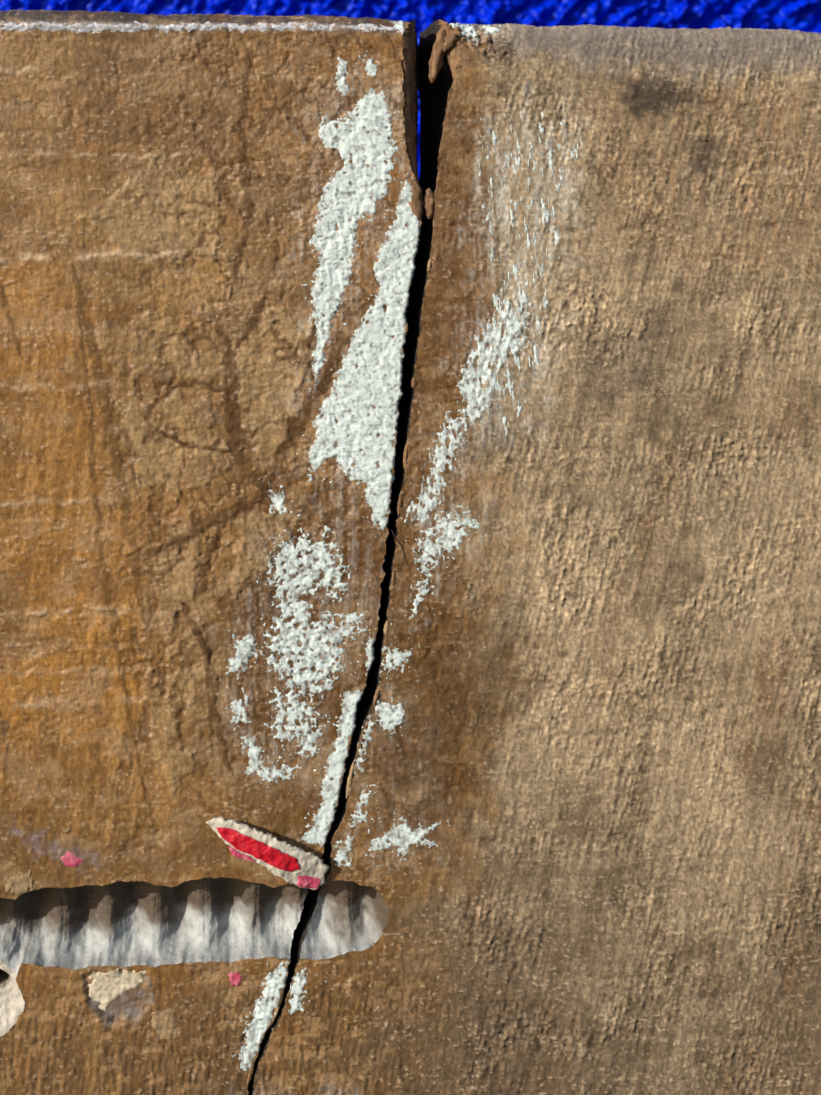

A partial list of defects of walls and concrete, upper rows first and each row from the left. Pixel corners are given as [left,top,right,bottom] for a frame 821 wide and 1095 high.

crack [246,19,462,1095]
peeling [88,966,146,1011]
peeling [150,1008,177,1040]
peeling [222,962,315,1090]